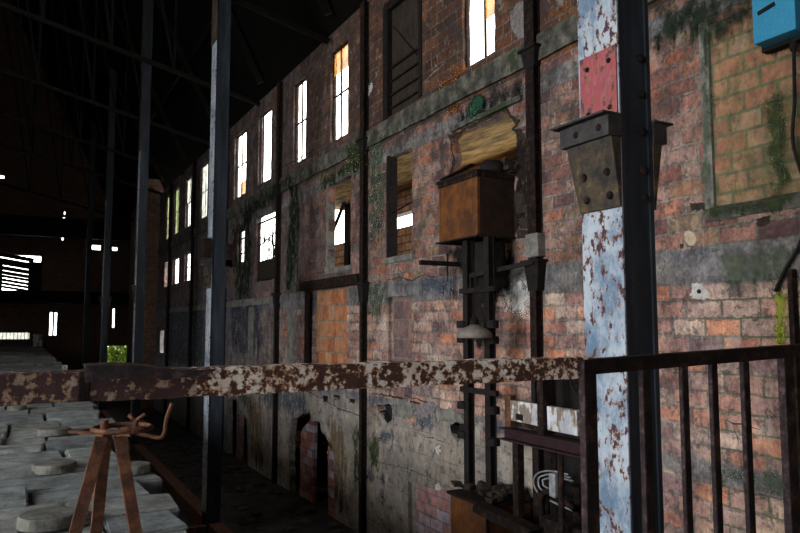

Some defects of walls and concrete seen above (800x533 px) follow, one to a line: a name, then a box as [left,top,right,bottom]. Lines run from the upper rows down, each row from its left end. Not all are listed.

spalling [448,108,526,174]
damp [502,281,530,313]
spalling [690,282,709,300]
peeling [374,398,464,447]